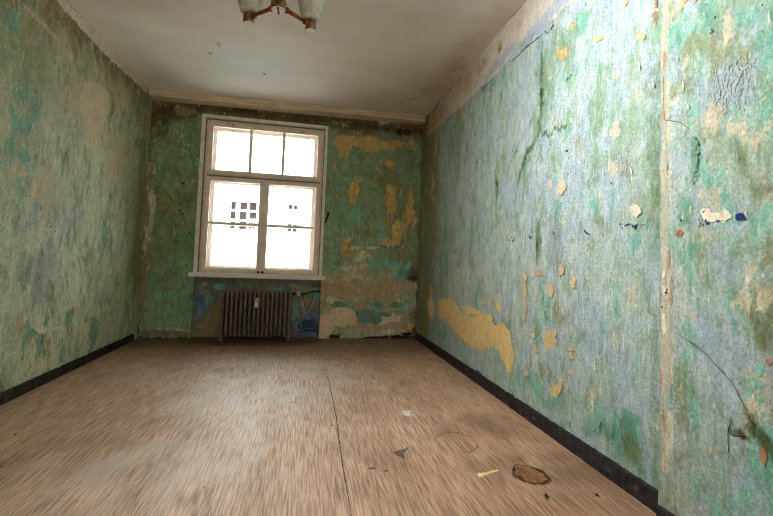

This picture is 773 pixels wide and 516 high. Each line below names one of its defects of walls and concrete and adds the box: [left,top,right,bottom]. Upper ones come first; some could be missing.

peeling [427,0,586,137]
crack [482,24,554,90]
flaking render [547,174,568,195]
flaking render [619,204,645,230]
spalling [659,0,682,458]
flaking render [698,208,747,227]
flaking render [288,284,402,338]
peeling [428,207,576,376]
peeling [541,382,562,411]
crack [675,332,761,453]